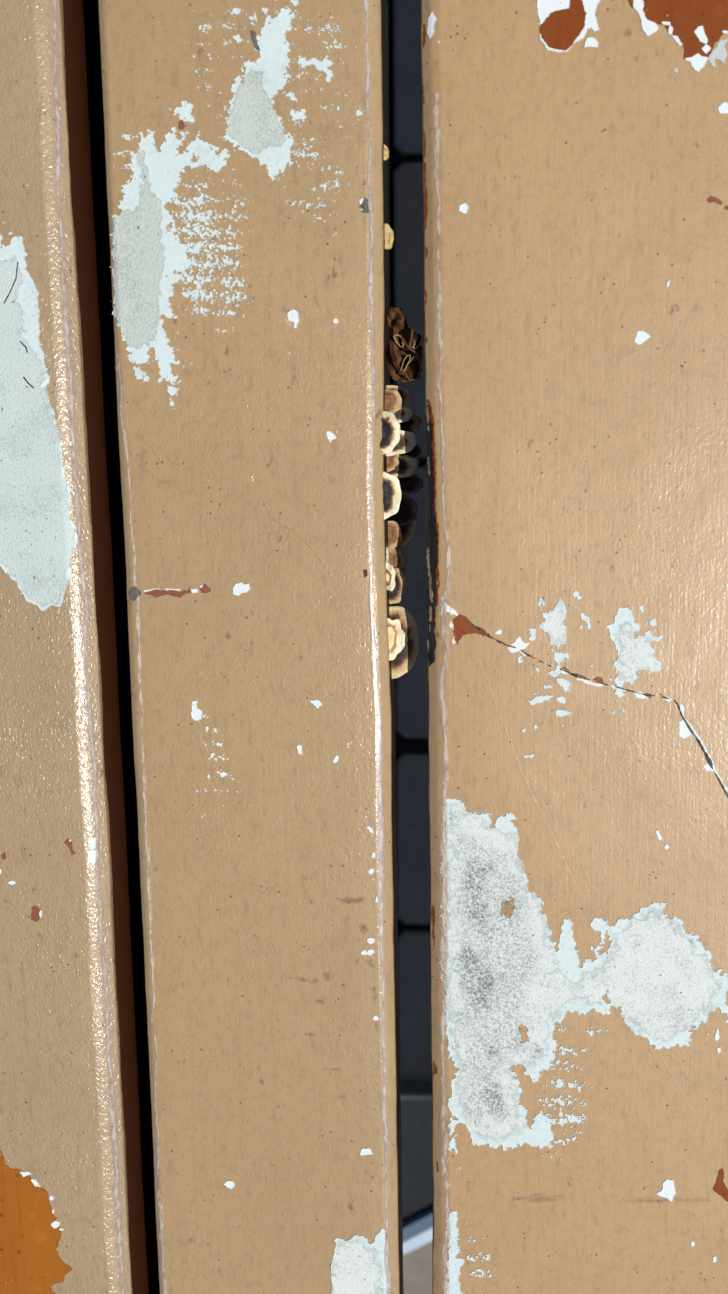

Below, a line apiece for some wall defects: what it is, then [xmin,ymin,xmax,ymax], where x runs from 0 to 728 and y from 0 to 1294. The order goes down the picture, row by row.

peeling [537,0,601,53]
peeling [628,0,728,73]
peeling [110,0,364,409]
peeling [0,222,78,611]
crack [440,602,728,797]
peeling [520,591,666,727]
spalling [31,906,42,922]
peeling [432,798,728,1170]
peeling [0,1150,72,1294]
peeling [331,1228,389,1294]
peeling [444,1210,501,1294]
peeling [713,1168,728,1202]